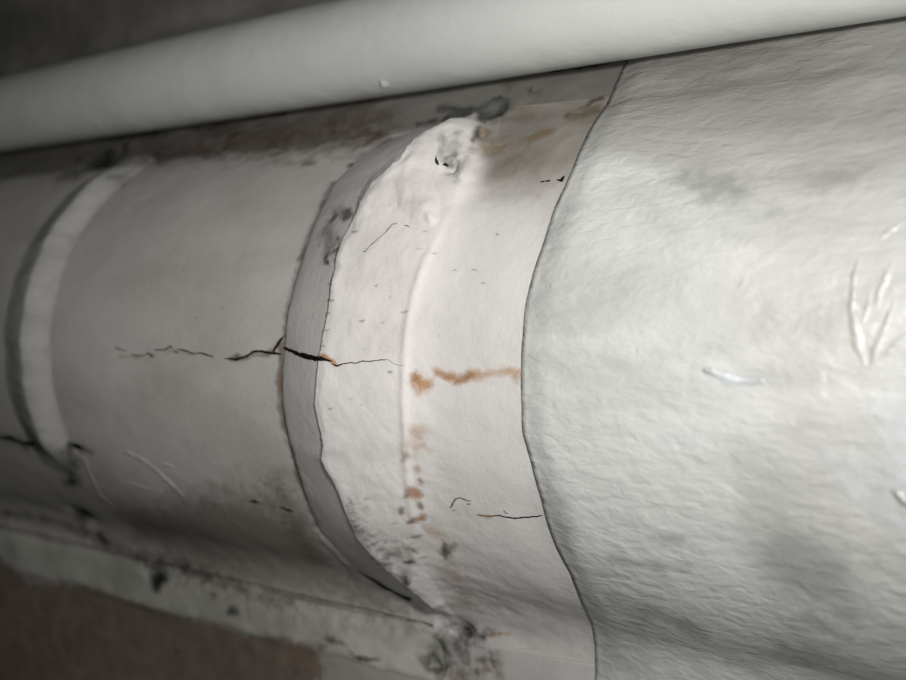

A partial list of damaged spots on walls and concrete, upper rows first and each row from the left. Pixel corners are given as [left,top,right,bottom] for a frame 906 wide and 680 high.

crack [115,336,403,367]
crack [0,436,36,446]
corrosion [408,489,424,523]
crack [450,497,542,519]
damp [0,559,323,680]